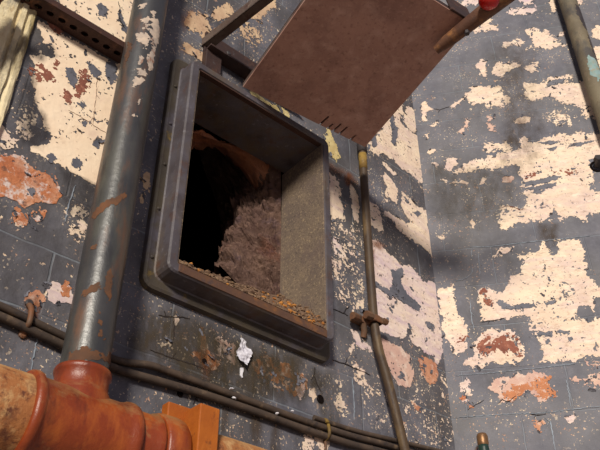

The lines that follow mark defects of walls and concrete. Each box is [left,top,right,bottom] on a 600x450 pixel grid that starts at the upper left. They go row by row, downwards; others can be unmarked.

peeling [24,280,73,312]
peeling [0,20,120,231]
peeling [323,128,341,163]
peeling [329,172,366,312]
peeling [367,101,440,257]
peeling [450,59,540,132]
peeling [432,74,600,230]
peeling [346,328,393,429]